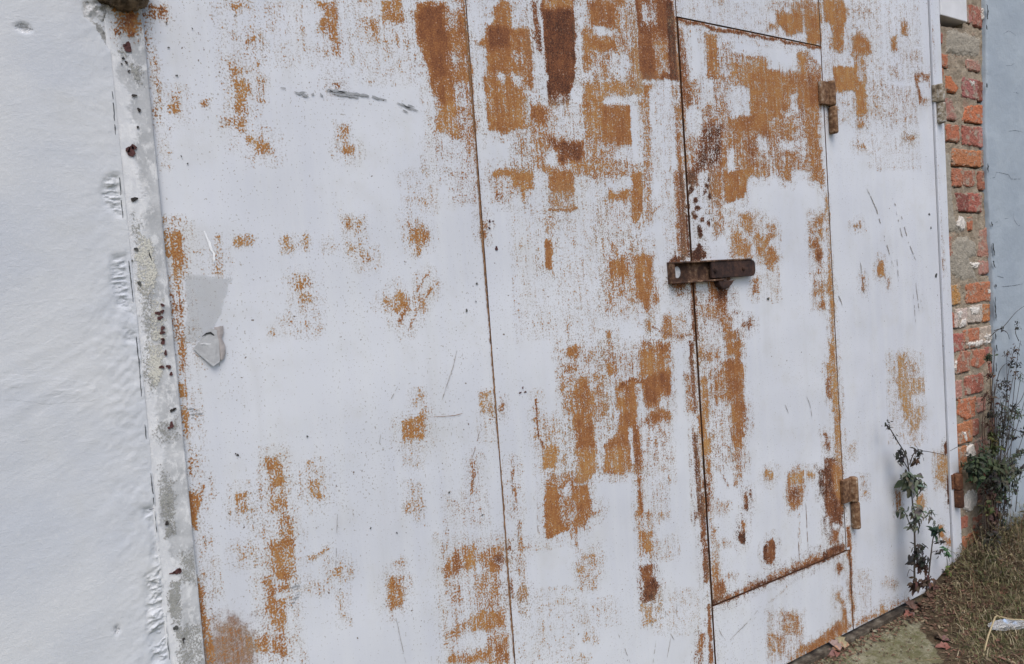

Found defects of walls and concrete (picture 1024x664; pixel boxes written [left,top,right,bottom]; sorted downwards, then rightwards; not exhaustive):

corrosion [162,216,355,664]
corrosion [209,0,935,664]